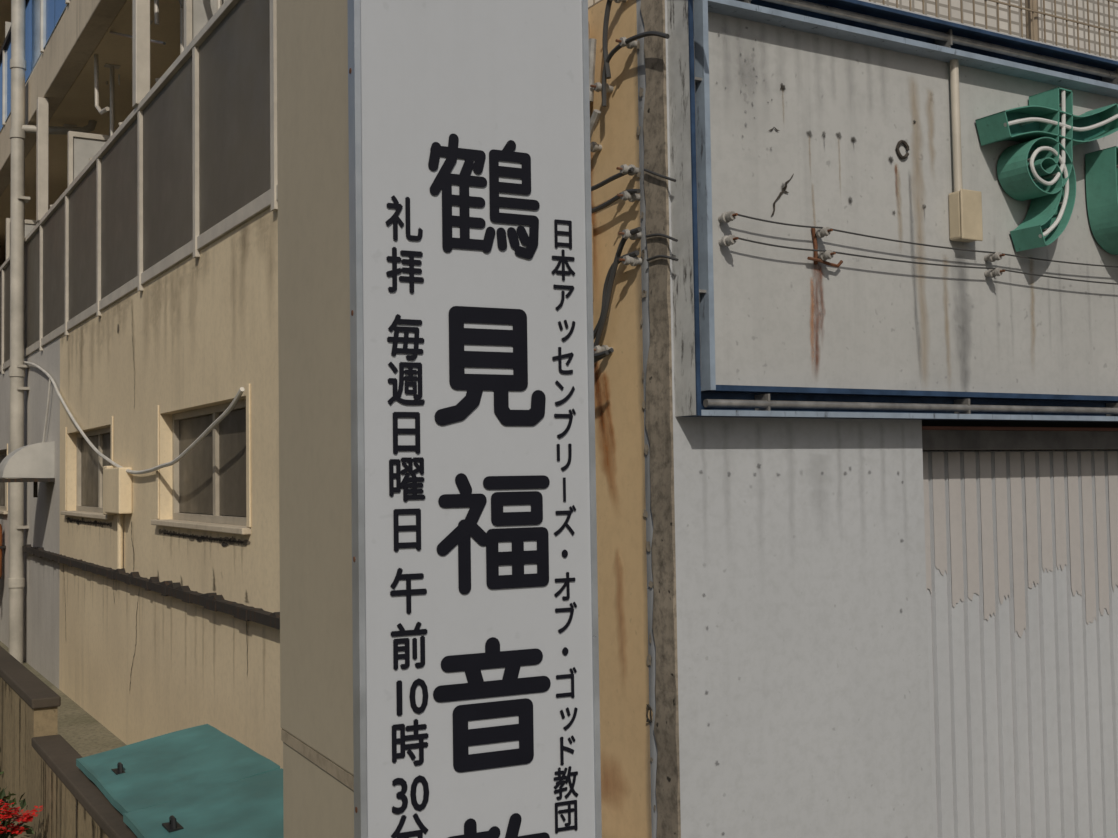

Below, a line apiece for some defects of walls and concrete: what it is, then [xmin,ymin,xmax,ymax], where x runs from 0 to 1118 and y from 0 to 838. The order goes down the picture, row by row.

corrosion [812,267,823,364]
corrosion [595,363,612,468]